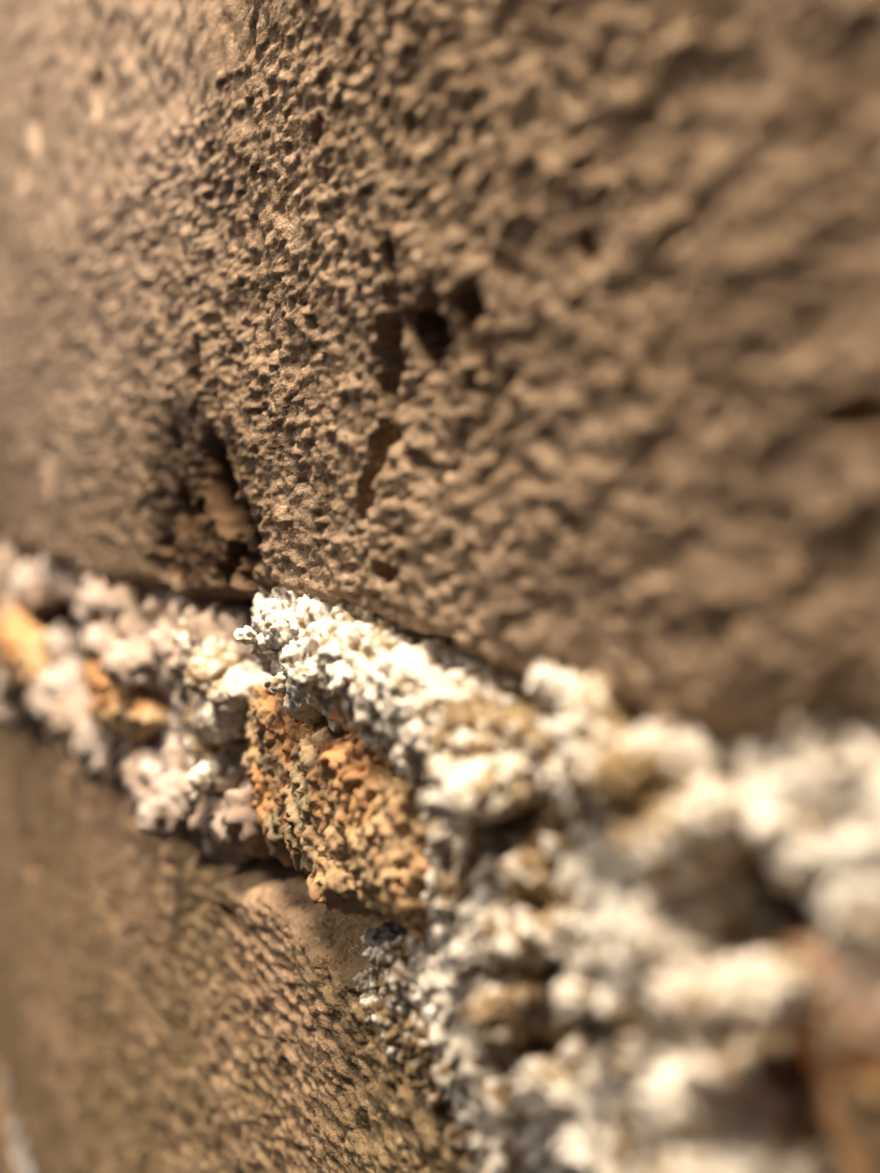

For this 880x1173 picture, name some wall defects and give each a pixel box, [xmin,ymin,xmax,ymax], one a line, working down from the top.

crack [395,288,494,374]
spalling [814,394,880,437]
crack [402,439,460,472]
spalling [374,564,400,584]
spalling [0,533,295,870]